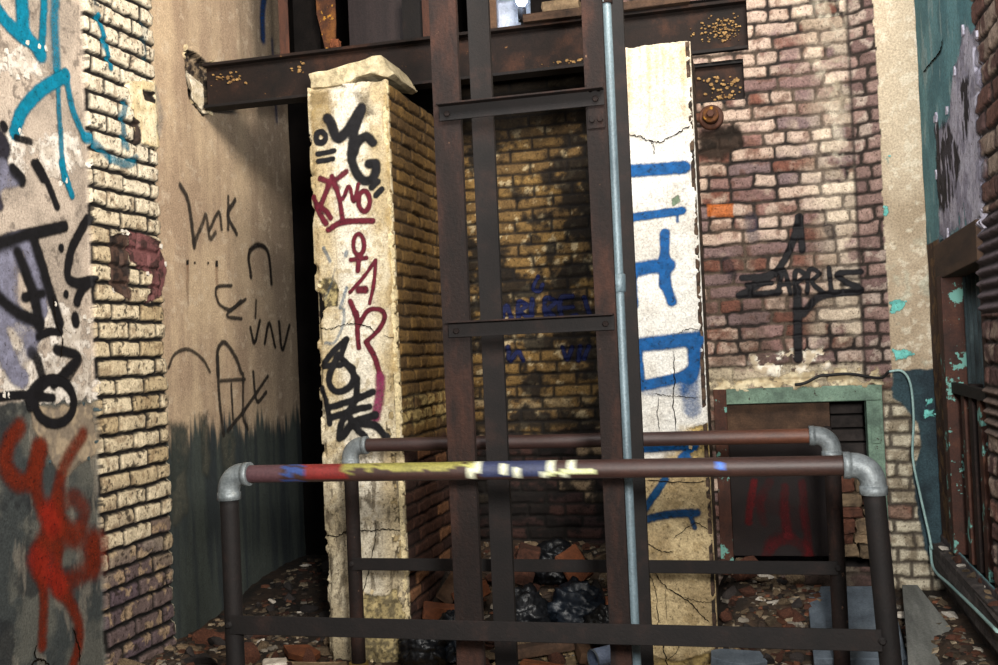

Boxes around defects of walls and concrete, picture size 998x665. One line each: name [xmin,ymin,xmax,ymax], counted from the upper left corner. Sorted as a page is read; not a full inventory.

crack [629,125,691,154]
peeling [933,25,988,240]
leakage [170,424,188,524]
crack [648,522,710,665]
crack [31,645,49,665]